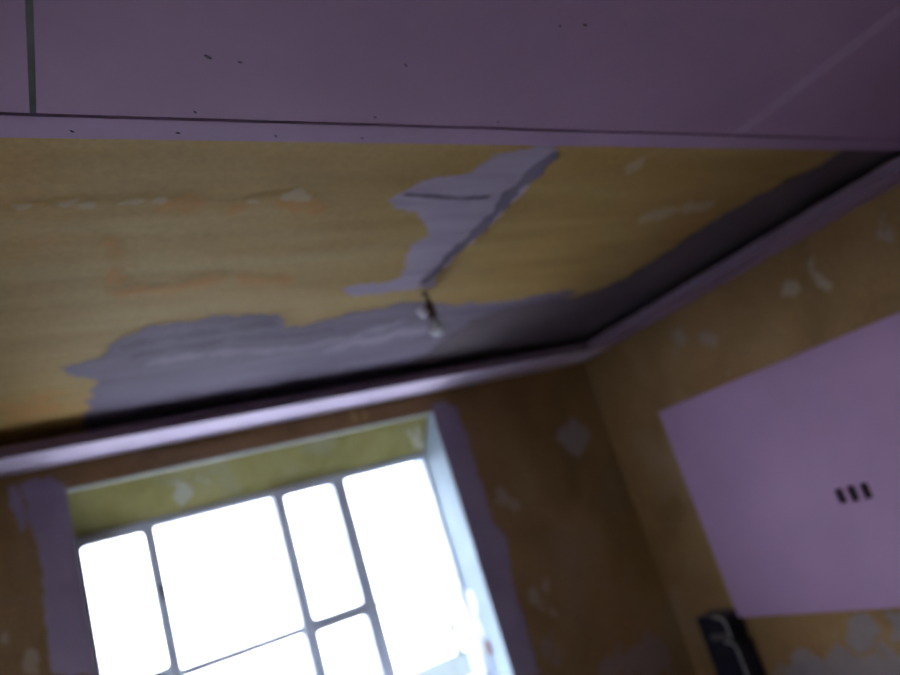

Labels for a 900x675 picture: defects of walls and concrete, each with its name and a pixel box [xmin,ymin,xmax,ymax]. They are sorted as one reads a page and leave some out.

peeling [388,150,900,378]